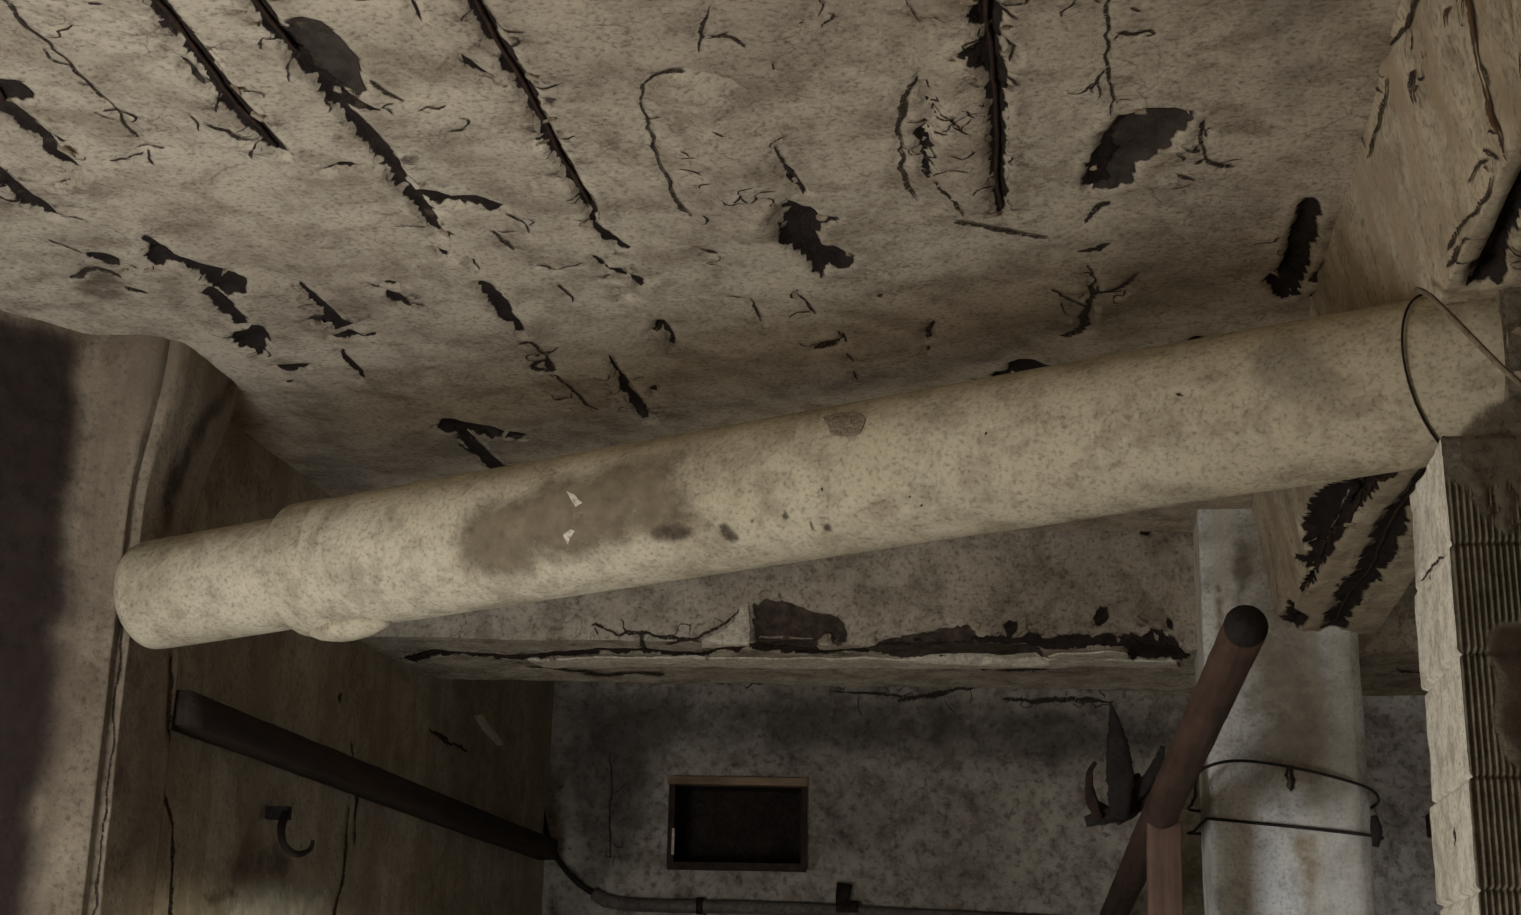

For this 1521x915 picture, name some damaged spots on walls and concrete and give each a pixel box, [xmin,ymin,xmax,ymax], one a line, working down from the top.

spalling [236,0,504,255]
spalling [455,0,644,286]
spalling [957,0,1028,219]
spalling [1080,108,1194,190]
crack [1361,0,1521,270]
spalling [777,164,854,278]
leakage [464,460,692,572]
spalling [1279,467,1427,629]
crack [526,610,739,677]
flaking render [399,591,1191,670]
crack [831,669,1114,715]
leakage [1492,628,1521,757]